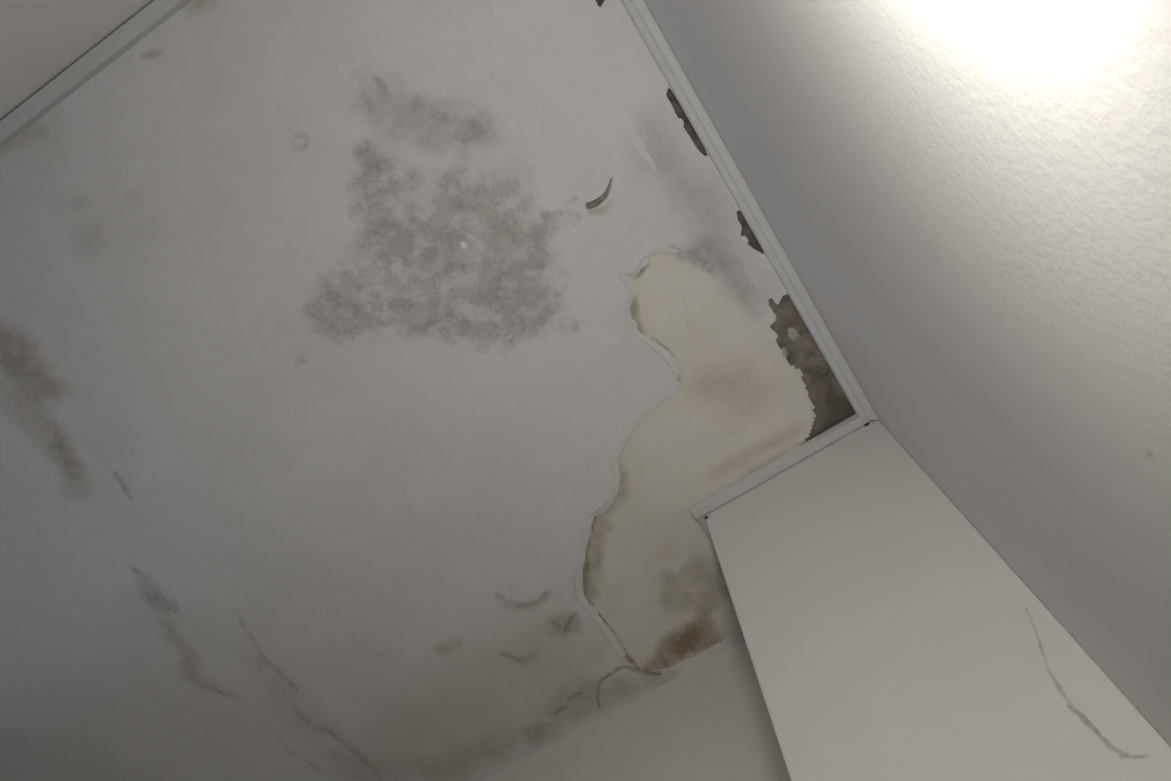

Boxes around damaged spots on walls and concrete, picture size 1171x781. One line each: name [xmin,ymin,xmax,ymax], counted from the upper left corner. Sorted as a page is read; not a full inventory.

spalling [666,88,707,156]
peeling [586,178,611,209]
spalling [737,211,764,253]
peeling [574,247,856,671]